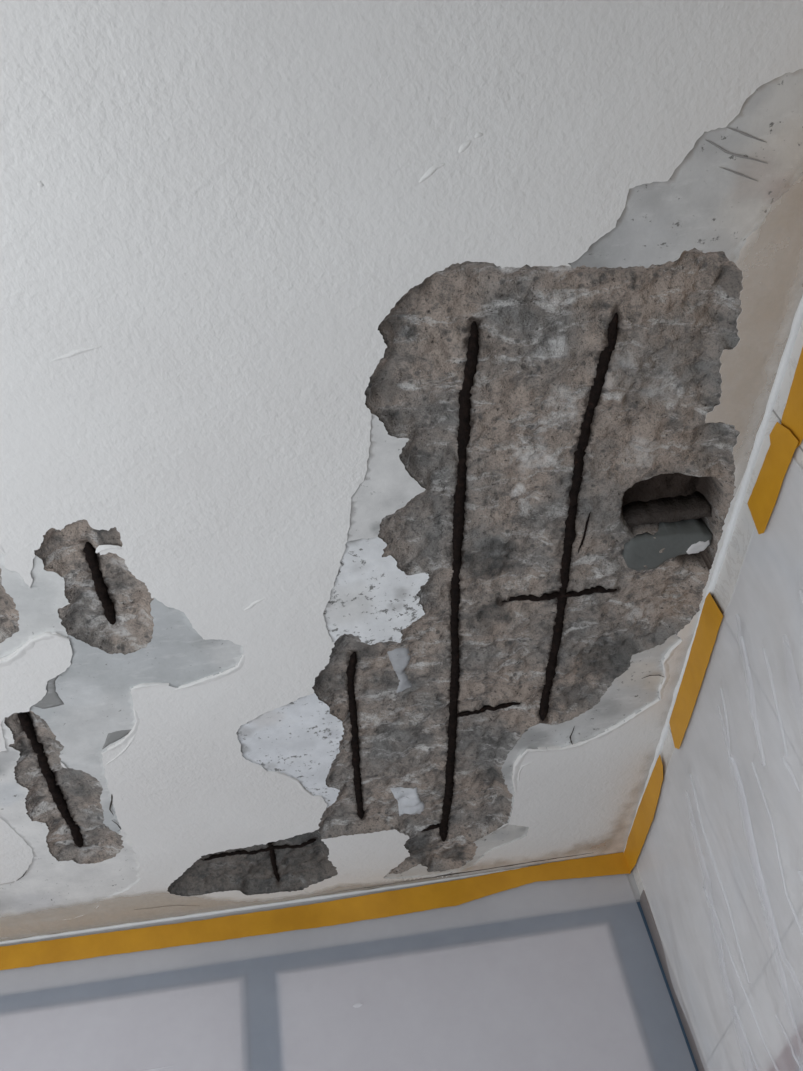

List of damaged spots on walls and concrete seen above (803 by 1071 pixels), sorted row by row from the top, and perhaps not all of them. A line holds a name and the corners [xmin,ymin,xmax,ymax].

peeling [0,519,245,920]
spalling [167,69,803,897]